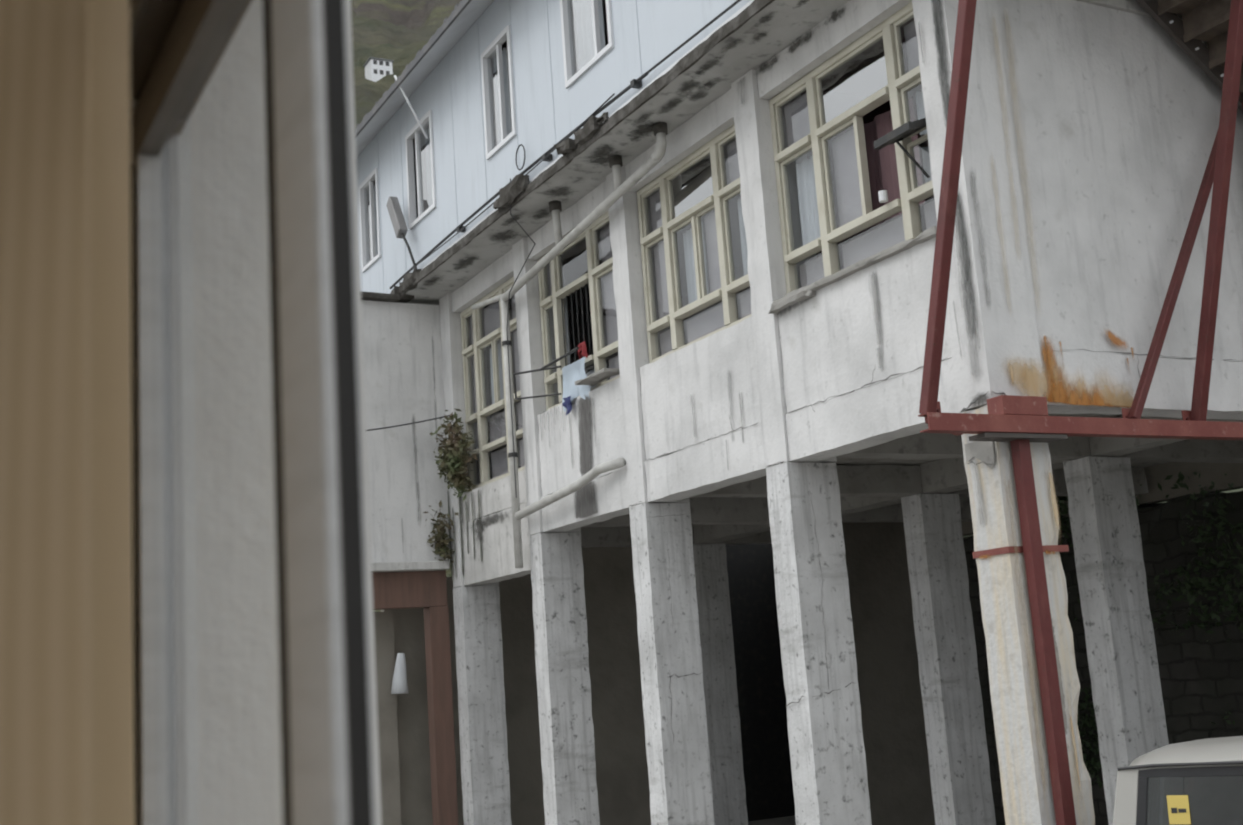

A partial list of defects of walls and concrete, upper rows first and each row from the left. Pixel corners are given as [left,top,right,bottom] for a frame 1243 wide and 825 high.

water stain [631,15,772,141]
water stain [757,32,812,72]
water stain [918,0,949,126]
water stain [590,145,617,165]
water stain [491,188,569,242]
water stain [454,257,478,270]
corrosion [1010,336,1133,408]
corrosion [1107,331,1134,366]